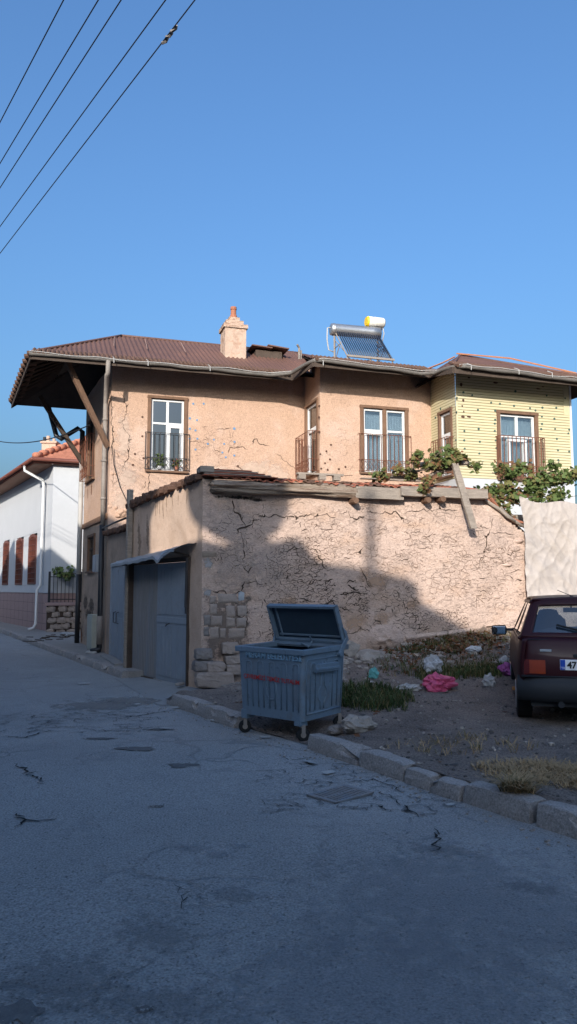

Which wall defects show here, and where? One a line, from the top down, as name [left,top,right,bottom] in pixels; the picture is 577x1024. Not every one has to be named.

crack [109,391,150,490]
crack [209,500,522,642]
flaking render [203,591,251,659]
crack [15,763,42,784]
crack [14,813,56,827]
crack [248,757,464,851]